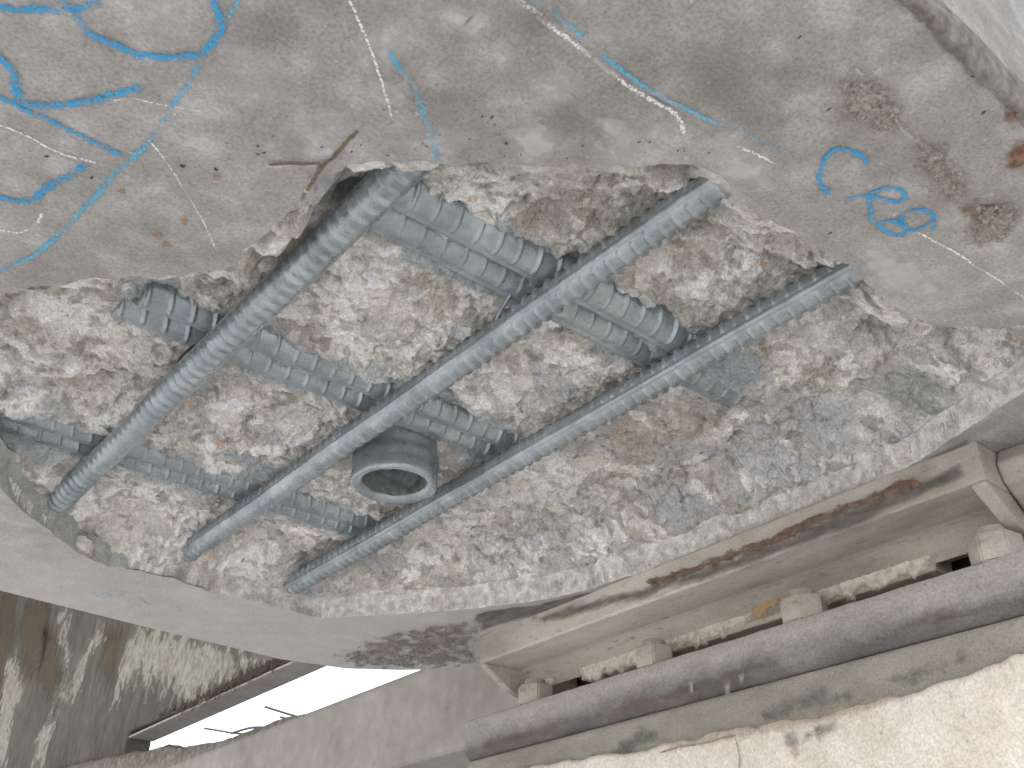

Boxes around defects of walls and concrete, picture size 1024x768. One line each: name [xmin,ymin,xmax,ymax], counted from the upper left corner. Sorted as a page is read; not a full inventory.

spalling [0,160,1024,669]
corrosion [646,478,920,587]
efflorescence [0,649,24,768]
efflorescence [30,608,107,768]
efflorescence [110,625,265,711]